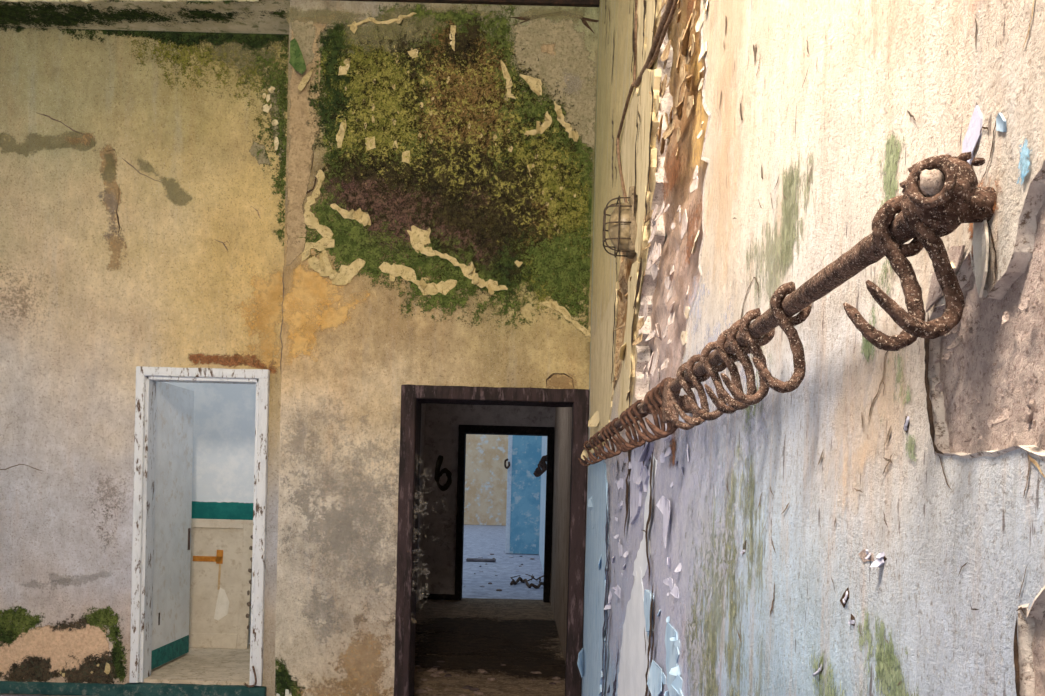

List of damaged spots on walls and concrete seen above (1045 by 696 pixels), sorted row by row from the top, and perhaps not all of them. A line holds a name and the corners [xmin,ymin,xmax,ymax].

leakage [0,131,127,270]
leakage [137,159,192,206]
leakage [298,3,593,332]
rust [940,152,985,166]
spalling [542,0,711,696]
spalling [925,160,1045,462]
rust [670,423,678,466]
peeling [0,624,110,679]
leakage [687,516,733,696]
leakage [718,545,739,618]
spalling [1018,586,1045,696]